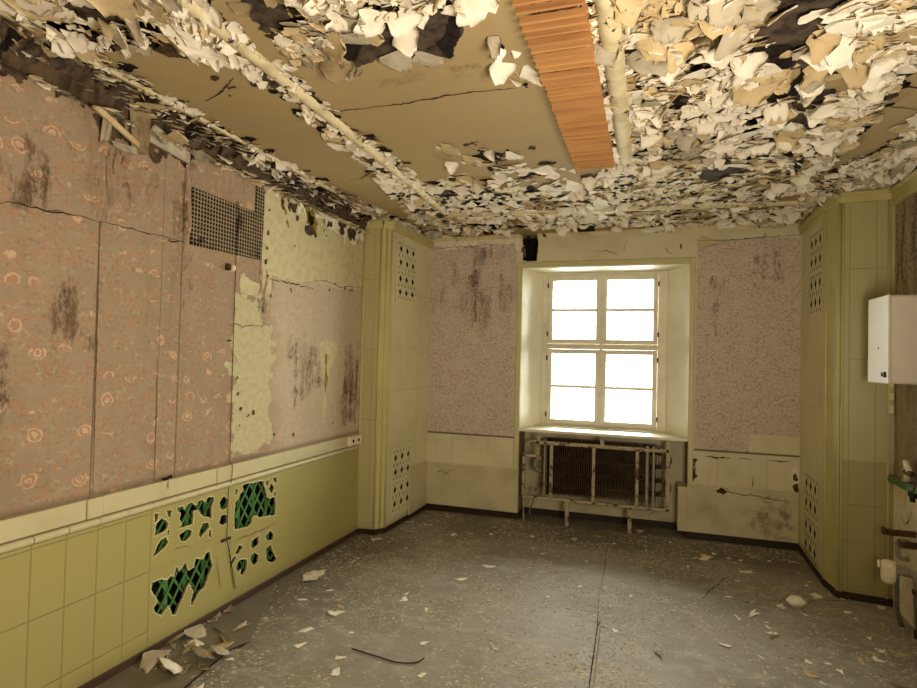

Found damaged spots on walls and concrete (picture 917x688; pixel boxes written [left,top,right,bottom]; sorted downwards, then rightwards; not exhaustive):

peeling [0,0,917,457]
crack [3,201,182,486]
spalling [150,550,213,617]
spalling [152,479,277,558]
spalling [229,530,277,576]
crack [706,456,789,503]